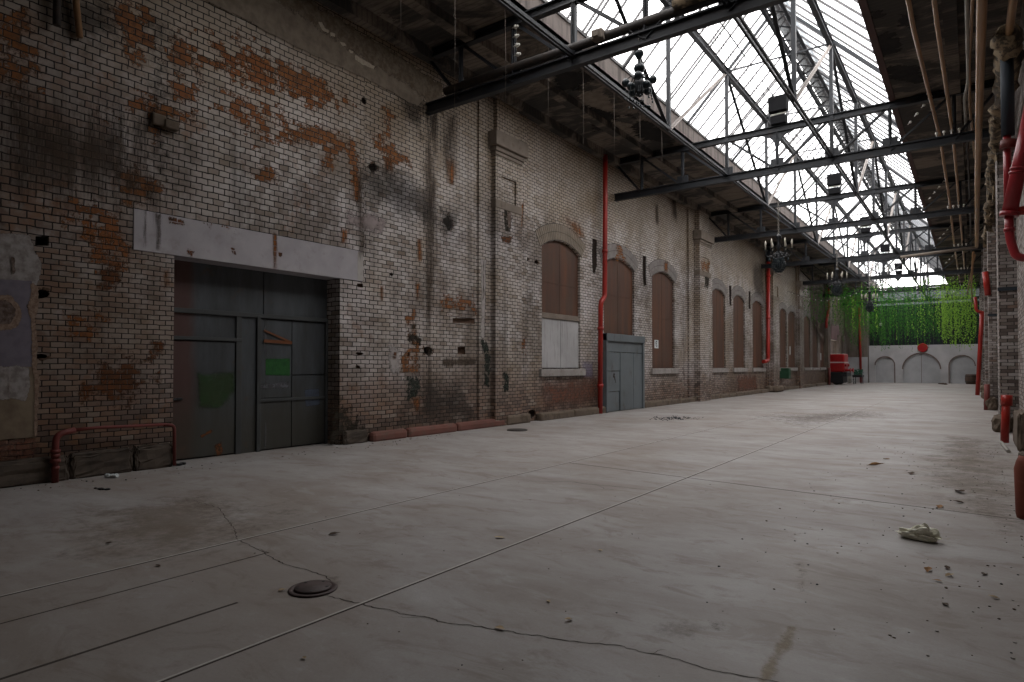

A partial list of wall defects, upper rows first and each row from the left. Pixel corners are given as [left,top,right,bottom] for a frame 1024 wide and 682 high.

spalling [0,0,46,100]
spalling [97,0,412,201]
spalling [42,164,168,290]
water stain [415,114,458,327]
flaking render [0,233,52,440]
crack [194,500,777,682]